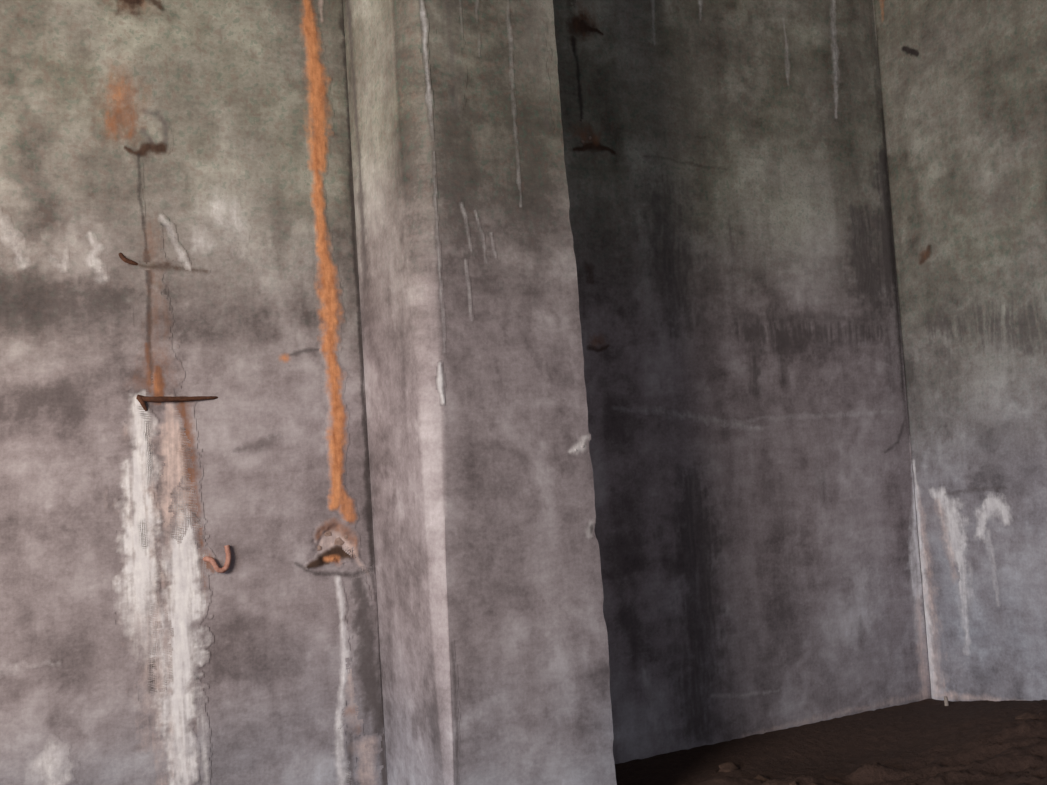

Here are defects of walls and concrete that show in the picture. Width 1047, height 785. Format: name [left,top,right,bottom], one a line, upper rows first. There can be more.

rust [97,0,167,21]
rust [119,252,210,274]
rust [277,0,360,525]
leakage [419,0,481,406]
leakage [505,0,557,208]
leakage [921,283,1047,387]
efflorescence [103,389,214,785]
rust [121,326,218,604]
spalling [292,515,374,580]
leakage [903,458,1015,702]